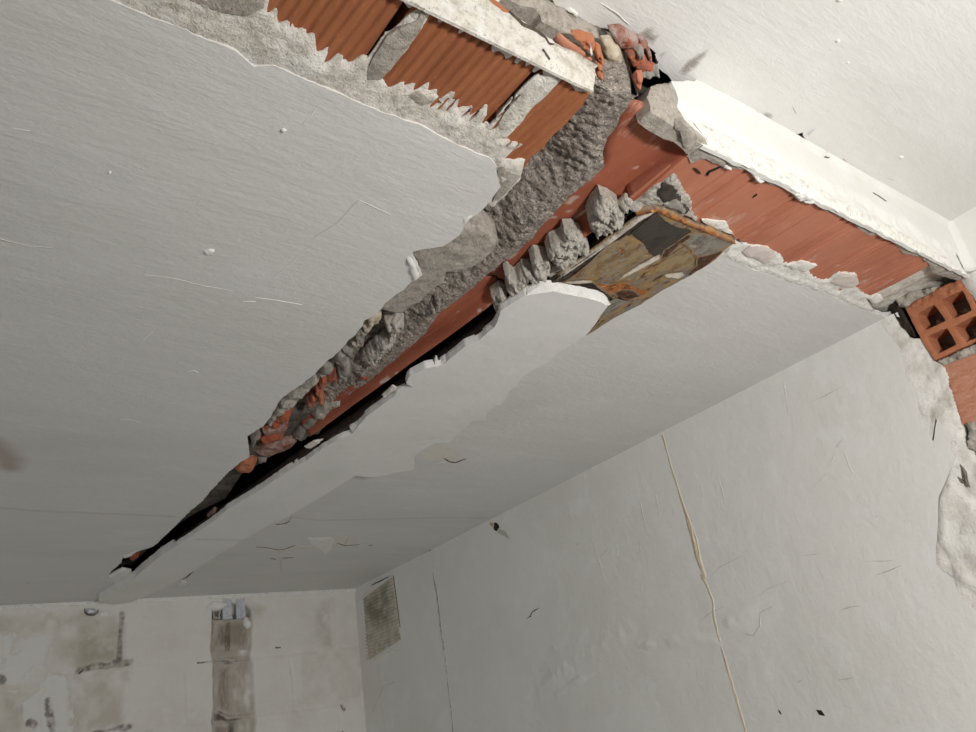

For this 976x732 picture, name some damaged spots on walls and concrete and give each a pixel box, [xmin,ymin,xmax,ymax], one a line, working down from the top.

spalling [108,549,147,582]
spalling [115,0,976,613]